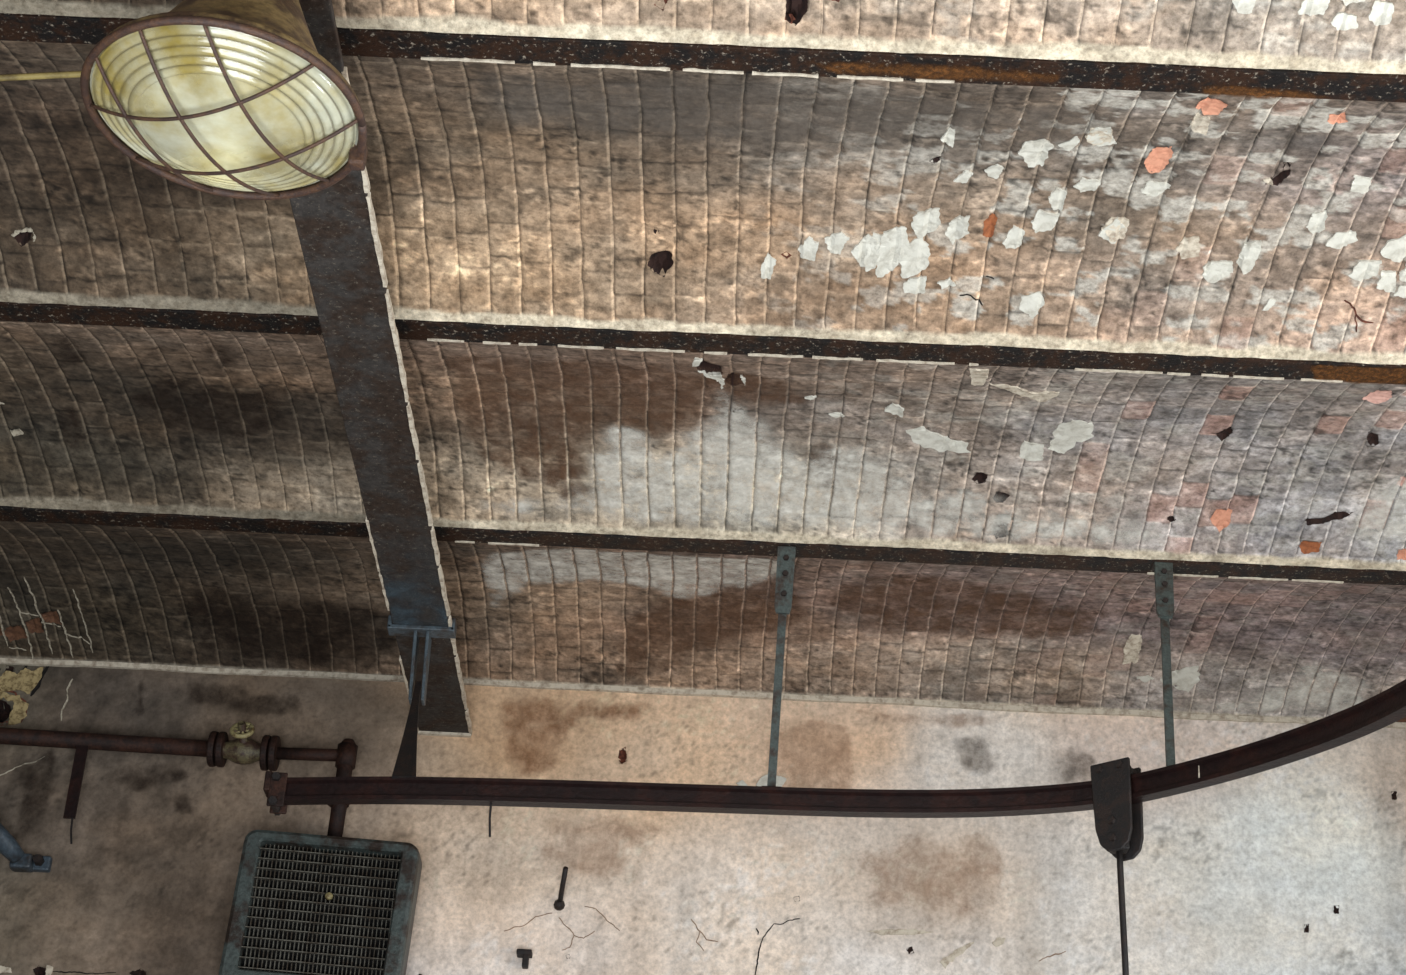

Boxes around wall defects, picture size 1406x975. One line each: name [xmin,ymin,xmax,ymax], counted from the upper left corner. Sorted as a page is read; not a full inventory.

spalling [785,0,808,26]
peeling [1297,0,1394,31]
peeling [1018,127,1117,167]
peeling [760,177,1101,294]
peeling [1098,217,1129,244]
peeling [1176,236,1262,283]
peeling [1348,234,1406,298]
water stain [448,357,1109,539]
peeling [884,403,971,453]
spalling [1298,511,1354,554]
water stain [485,549,796,672]
water stain [840,577,1093,637]